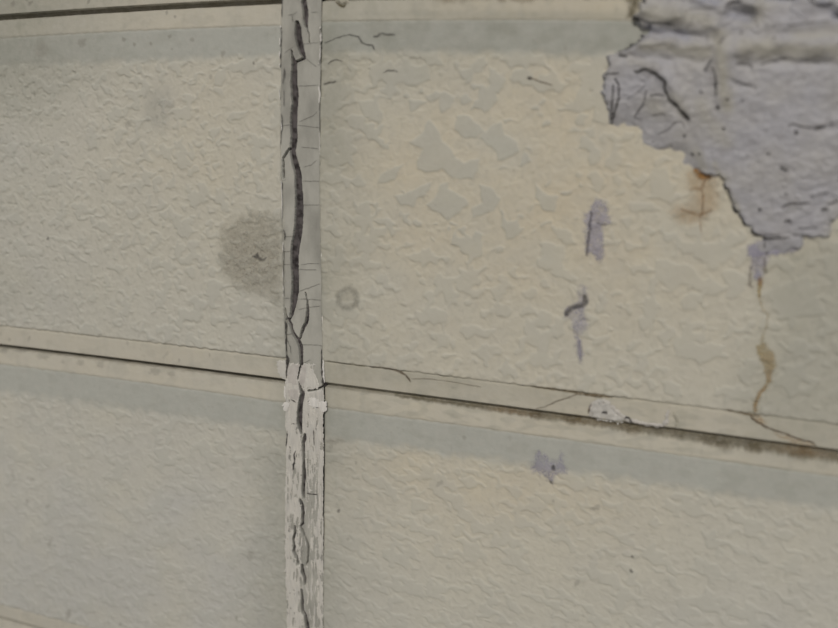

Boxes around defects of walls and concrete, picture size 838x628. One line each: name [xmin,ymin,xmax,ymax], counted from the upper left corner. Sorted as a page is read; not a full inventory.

crack [280,0,327,628]